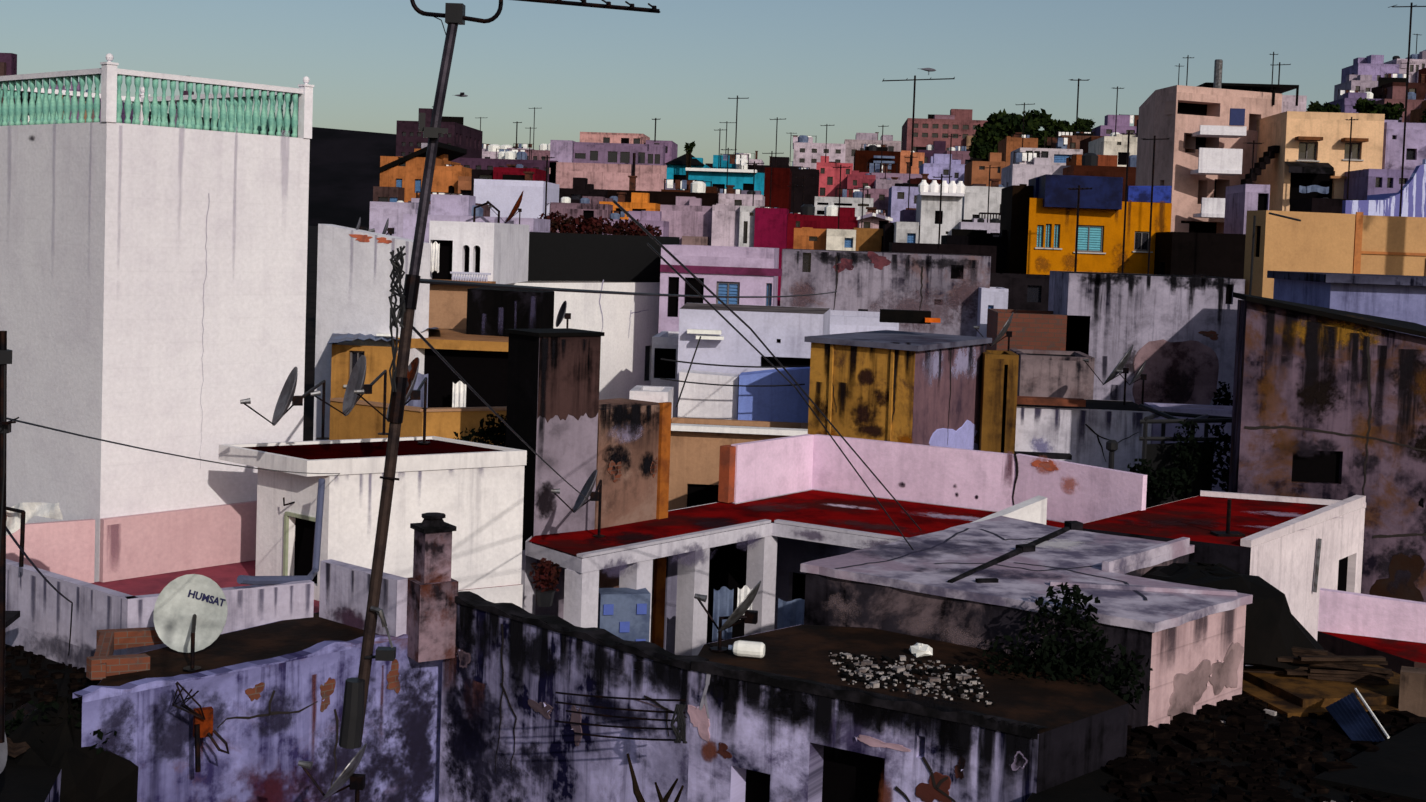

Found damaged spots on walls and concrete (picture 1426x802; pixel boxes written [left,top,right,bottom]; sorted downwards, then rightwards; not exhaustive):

leakage [1036,252,1234,323]
crack [199,193,210,467]
leakage [814,254,986,437]
leakage [1266,310,1426,462]
leakage [601,403,654,477]
peeling [1031,458,1076,492]
flaking render [245,682,265,701]
flaking render [320,677,336,712]
flaking render [387,659,401,694]
leakage [248,604,689,802]
leakage [706,673,1039,799]
flaking render [915,762,963,802]